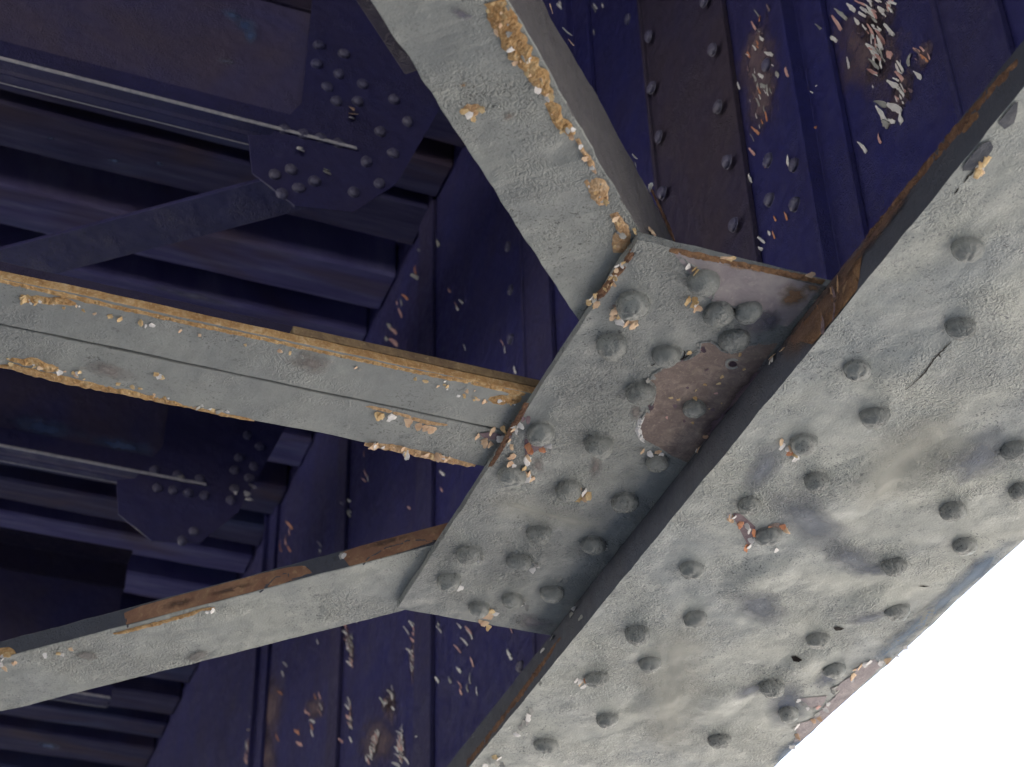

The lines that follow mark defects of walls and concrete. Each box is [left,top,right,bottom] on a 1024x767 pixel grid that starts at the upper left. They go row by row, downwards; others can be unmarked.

peeling [815,0,930,144]
corrosion [648,59,1018,350]
crack [907,342,951,389]
peeling [366,406,448,434]
peeling [635,340,785,462]
peeling [507,439,552,483]
peeling [727,513,790,552]
corrosion [113,607,215,635]
peeling [789,646,908,750]